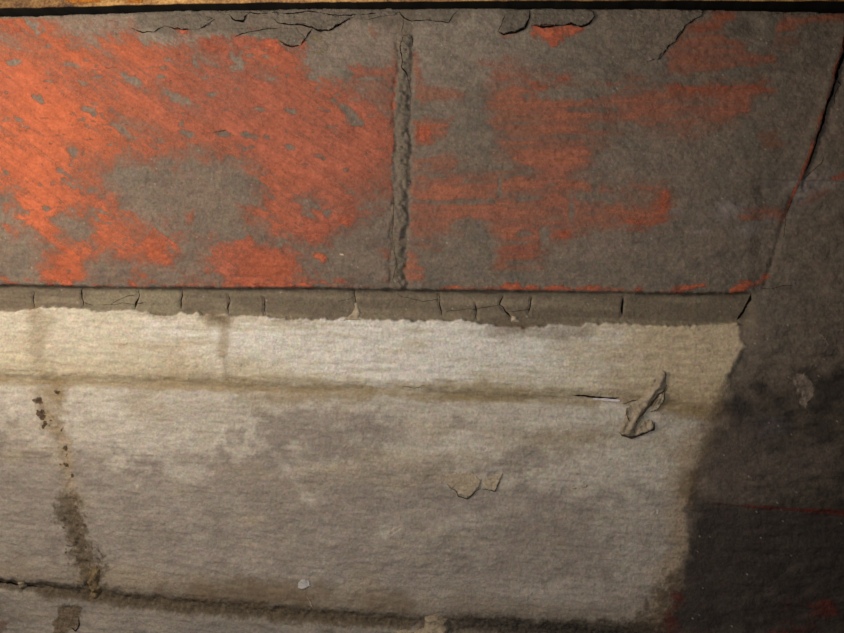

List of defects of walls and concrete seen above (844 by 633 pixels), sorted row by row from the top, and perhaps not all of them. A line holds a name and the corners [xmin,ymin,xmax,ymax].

peeling [498,9,594,47]
peeling [622,9,775,71]
peeling [0,10,396,288]
peeling [411,73,775,268]
crack [783,36,844,237]
crack [81,287,143,307]
peeling [487,282,623,291]
peeling [619,370,667,439]
damp [455,574,677,633]